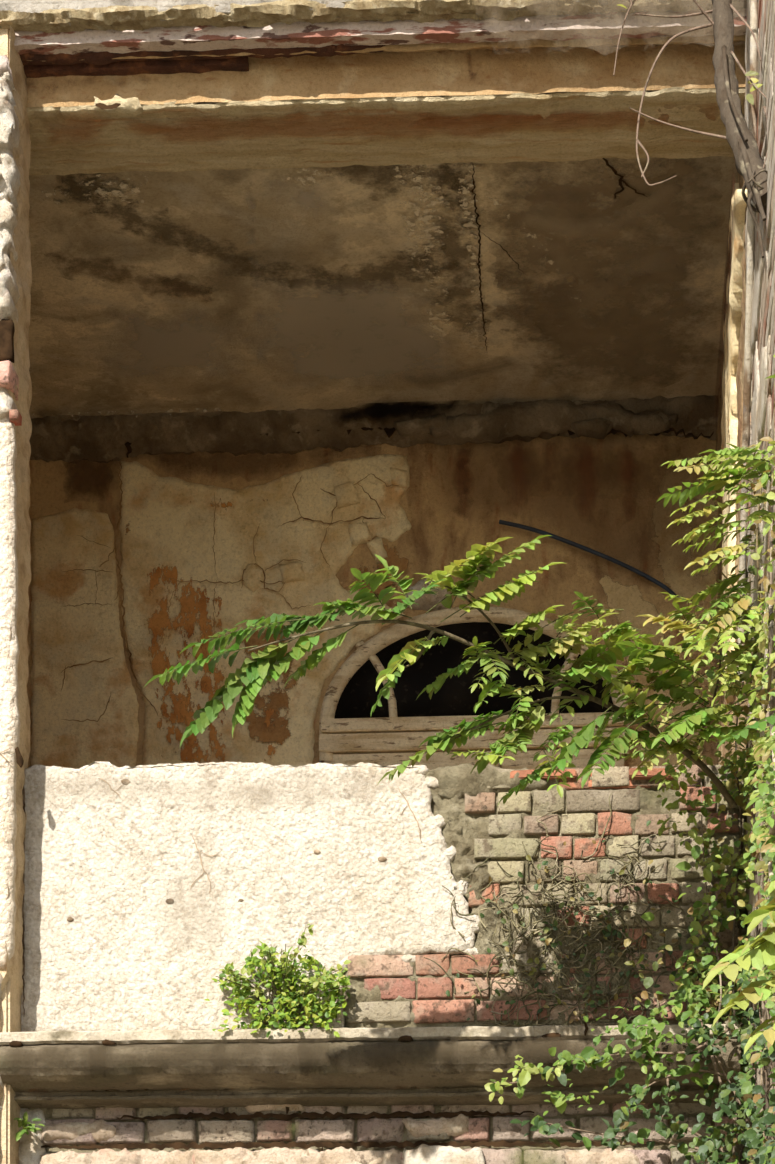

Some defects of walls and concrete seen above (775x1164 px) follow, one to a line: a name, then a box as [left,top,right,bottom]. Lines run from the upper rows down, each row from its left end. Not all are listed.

spalling [0,55,22,426]
spalling [94,94,144,117]
damp [41,162,578,361]
crack [471,162,526,351]
crack [602,158,647,199]
crack [260,427,396,438]
crack [607,428,729,491]
crack [61,442,158,722]
peeling [144,565,229,763]
peeling [242,625,297,761]
crack [165,474,398,677]
spalling [342,680,743,1042]